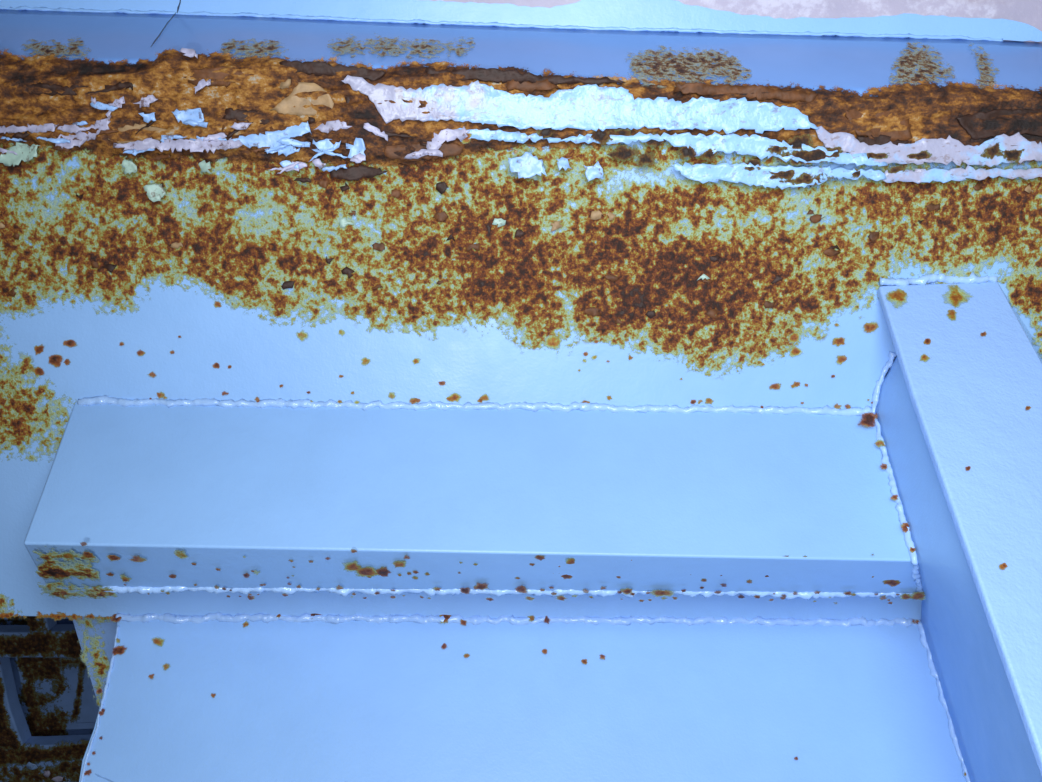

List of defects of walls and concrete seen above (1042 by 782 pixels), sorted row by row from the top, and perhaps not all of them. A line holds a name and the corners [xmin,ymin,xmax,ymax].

crack [151,0,181,46]
peeling [0,94,158,167]
peeling [113,108,388,175]
peeling [404,127,470,159]
peeling [508,152,547,179]
peeling [556,157,604,182]
peeling [143,183,166,202]
rust [0,33,1042,462]
rust [32,542,146,600]
rust [343,549,430,579]
rust [515,576,686,602]
rust [872,576,926,604]